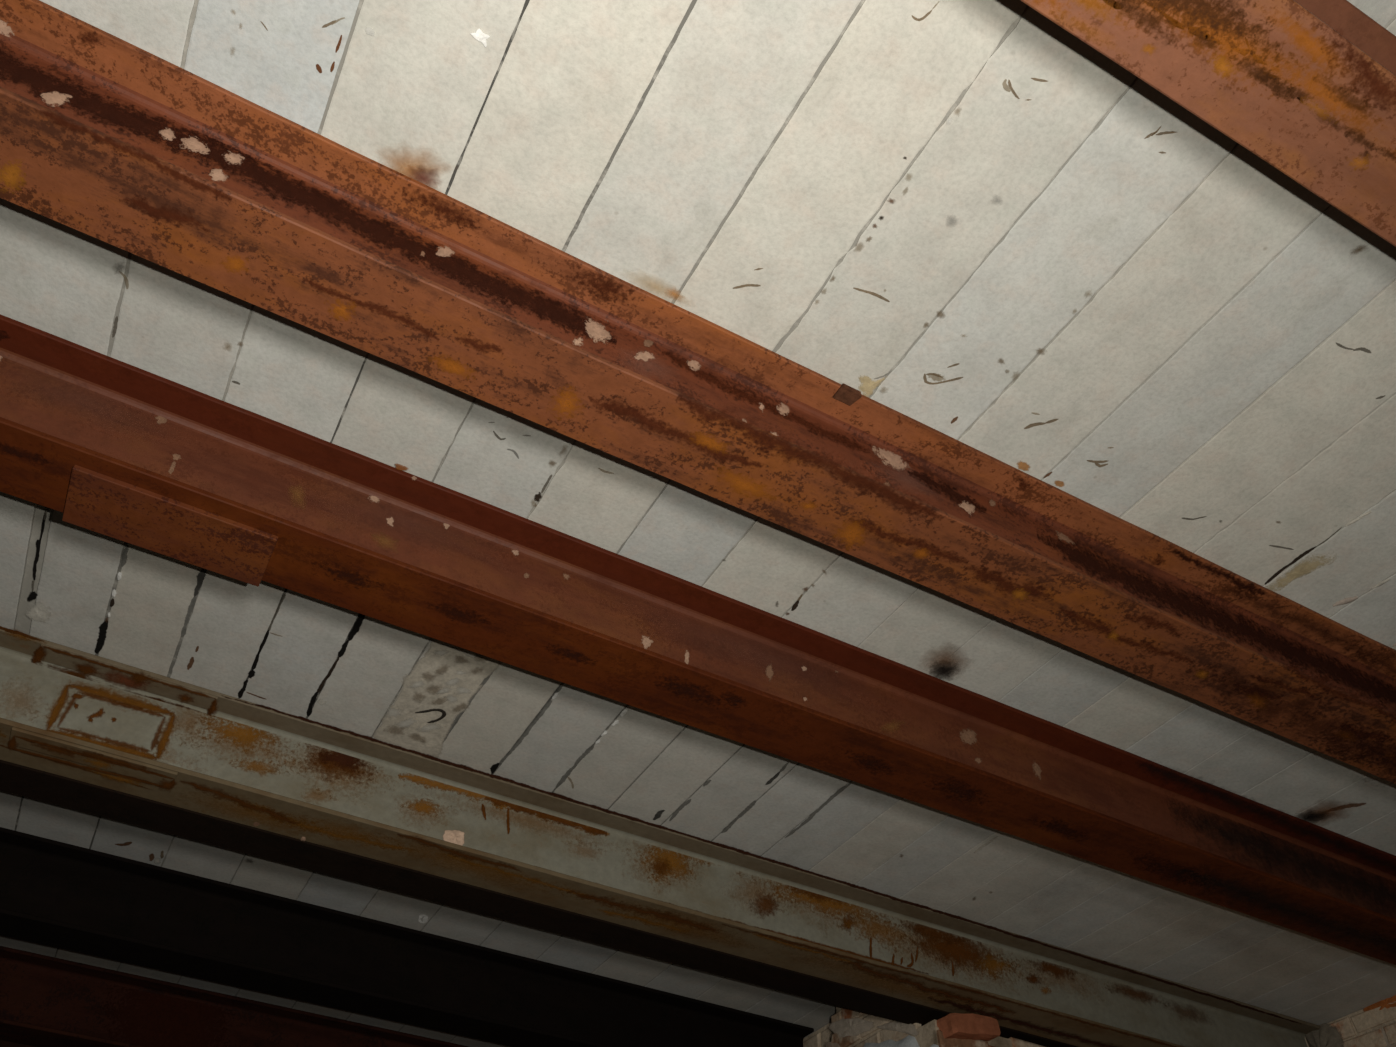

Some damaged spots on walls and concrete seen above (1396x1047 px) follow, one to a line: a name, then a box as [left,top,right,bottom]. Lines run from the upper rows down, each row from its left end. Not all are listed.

rust [316,35,342,73]
rust [0,49,620,343]
spalling [859,371,892,396]
rust [589,352,987,517]
crack [121,546,129,567]
crack [181,596,196,637]
rust [834,519,1396,703]
rust [1327,803,1366,812]
rust [0,626,1300,1047]
peeling [825,1018,939,1047]